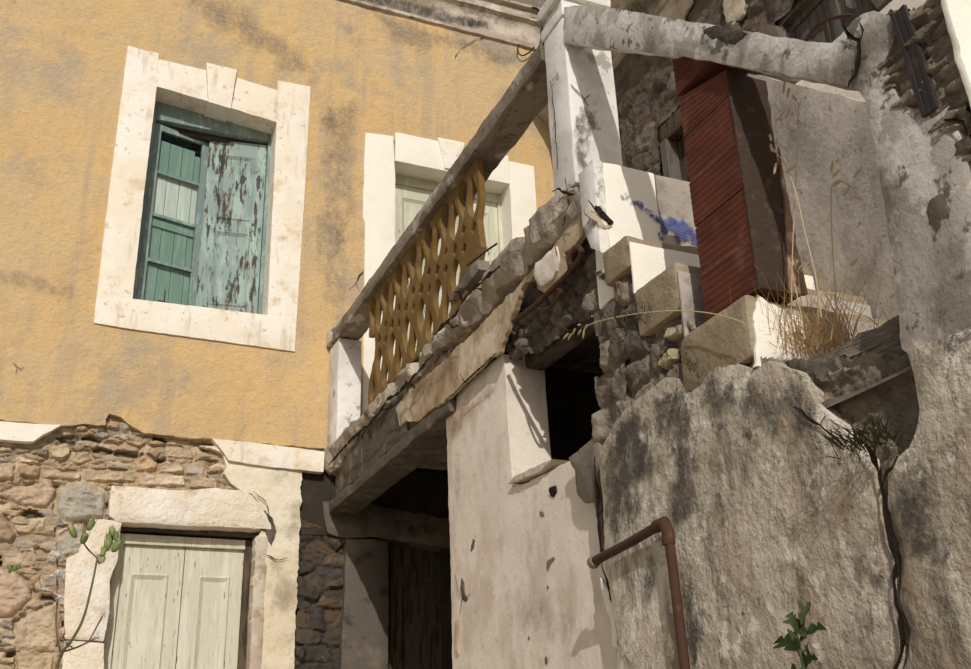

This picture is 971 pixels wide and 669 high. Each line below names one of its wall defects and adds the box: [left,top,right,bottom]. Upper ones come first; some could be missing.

damp [362,0,481,42]
flaking render [659,0,796,45]
flaking render [613,53,681,176]
peeling [927,193,950,232]
flaking render [0,416,237,669]
crack [329,266,500,465]
crack [594,456,612,603]
damp [603,395,694,541]
damp [643,554,654,602]
damp [681,573,703,665]
damp [696,379,811,440]
crack [794,406,908,669]